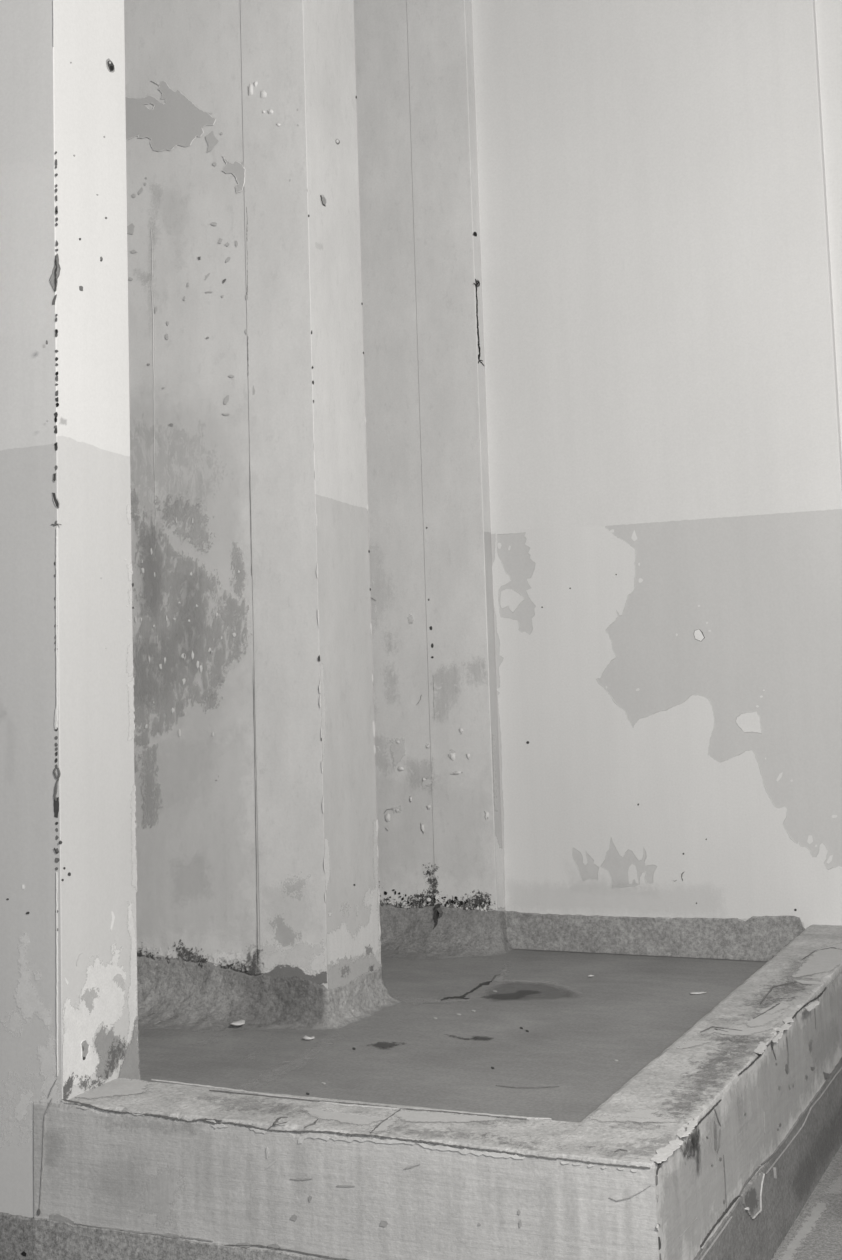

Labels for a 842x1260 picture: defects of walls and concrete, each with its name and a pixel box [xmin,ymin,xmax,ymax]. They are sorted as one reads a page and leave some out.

peeling [125,80,245,193]
crack [474,279,484,366]
peeling [46,151,175,1110]
peeling [125,504,252,748]
peeling [492,526,842,929]
peeling [209,819,439,990]
water stain [379,863,496,911]
water stain [487,991,539,1000]
flaking render [298,1132,525,1159]
flaking render [740,1172,765,1219]